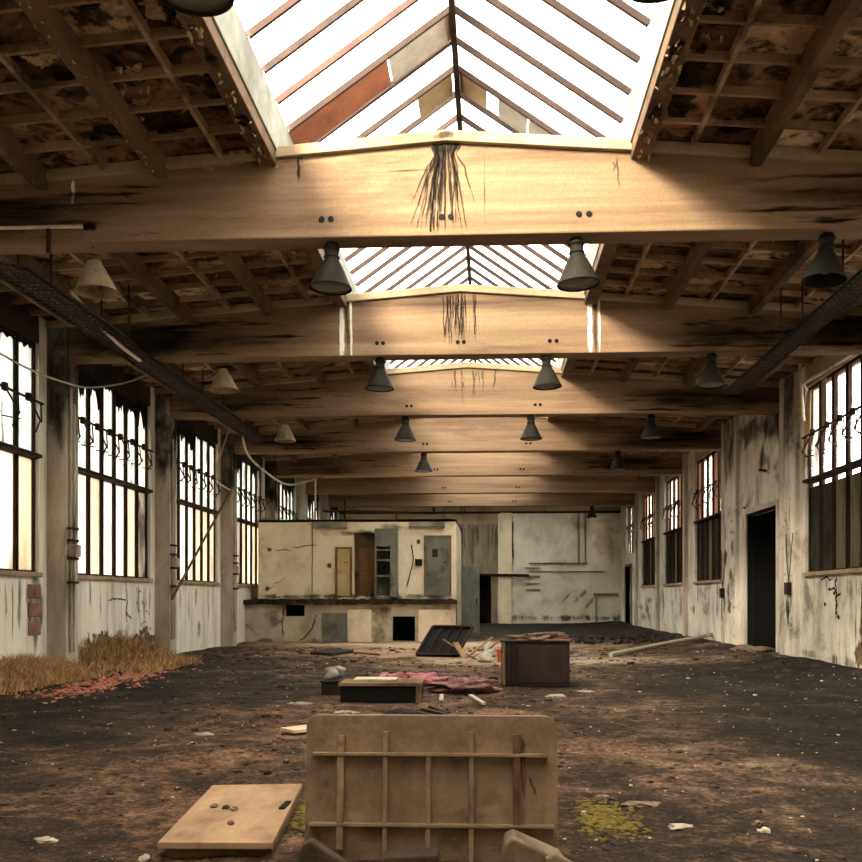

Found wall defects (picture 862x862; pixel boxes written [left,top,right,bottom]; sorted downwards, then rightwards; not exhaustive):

peeling [678,0,725,26]
peeling [138,0,289,171]
peeling [637,39,686,161]
damp [6,582,28,631]